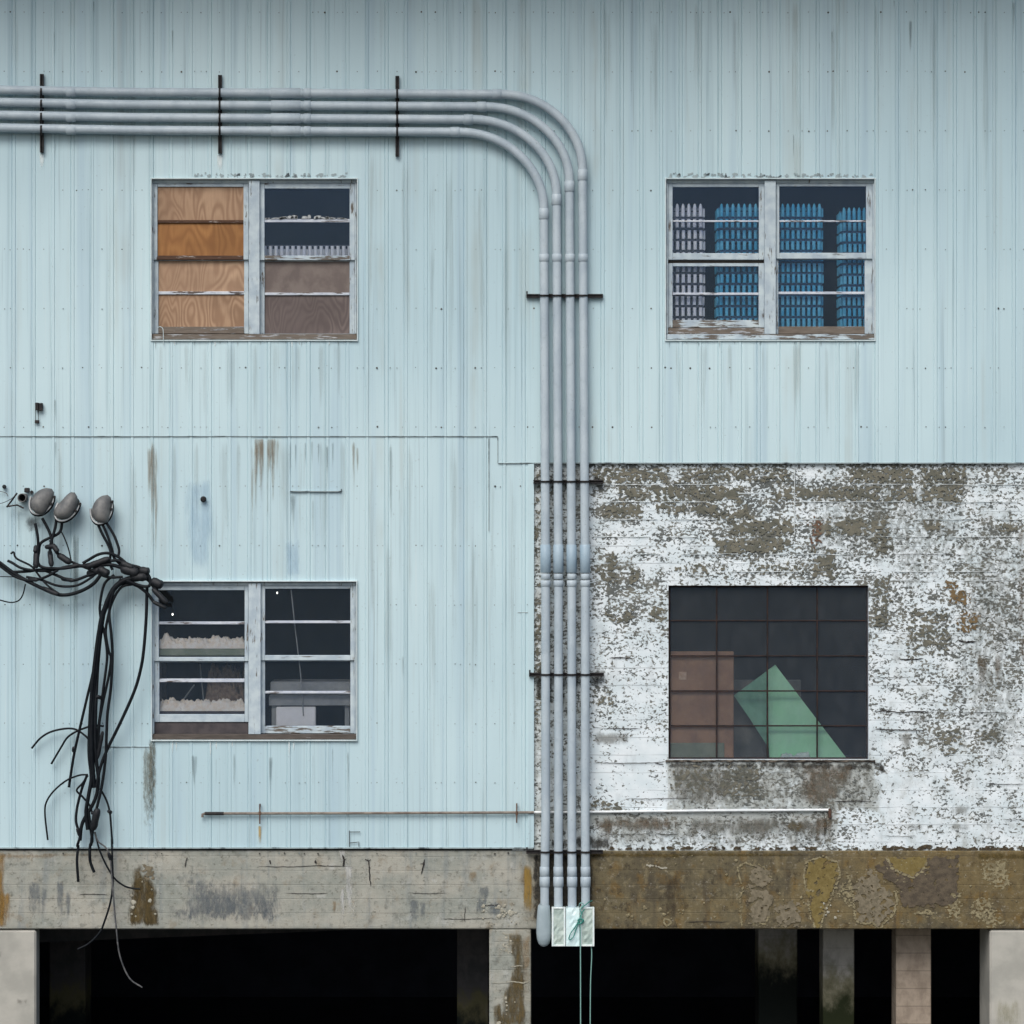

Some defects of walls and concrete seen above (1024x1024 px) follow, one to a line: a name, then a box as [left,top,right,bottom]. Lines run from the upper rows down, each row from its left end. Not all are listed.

peeling [591,465,969,586]
peeling [998,522,1019,534]
peeling [605,602,667,624]
peeling [869,573,954,656]
peeling [935,727,963,756]
peeling [976,724,1004,745]
damp [143,743,156,808]
peeling [668,763,765,798]
damp [670,762,884,802]
peeling [591,799,622,814]
damp [803,853,928,928]
damp [914,858,1012,928]